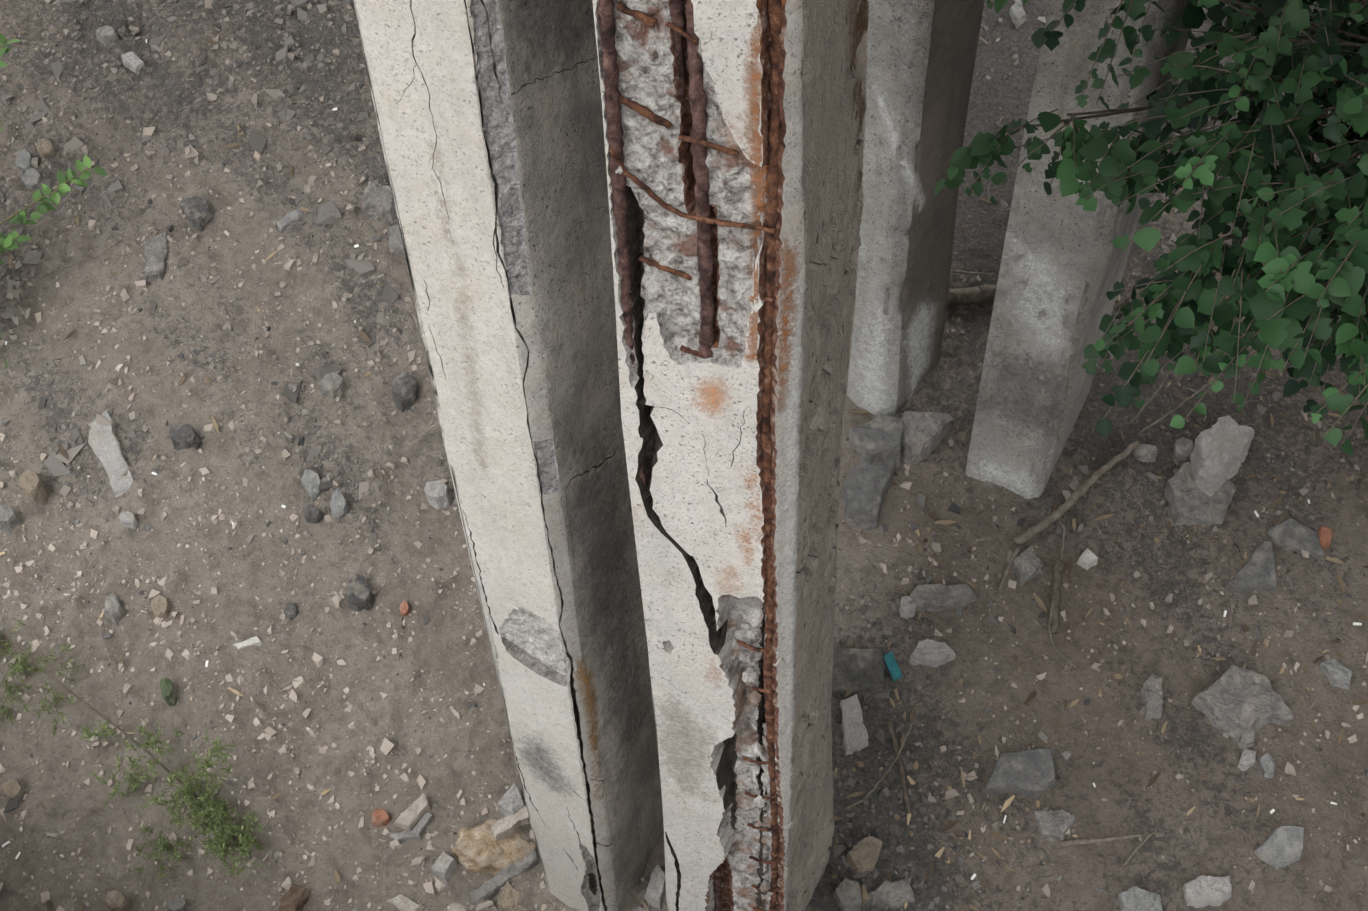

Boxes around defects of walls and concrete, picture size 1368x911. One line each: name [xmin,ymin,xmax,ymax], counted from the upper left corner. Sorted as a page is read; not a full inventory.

crack [396,0,451,236]
crack [424,280,446,380]
spalling [470,0,532,296]
crack [460,0,747,911]
spalling [595,0,791,911]
corrosion [745,23,769,361]
corrosion [777,250,796,410]